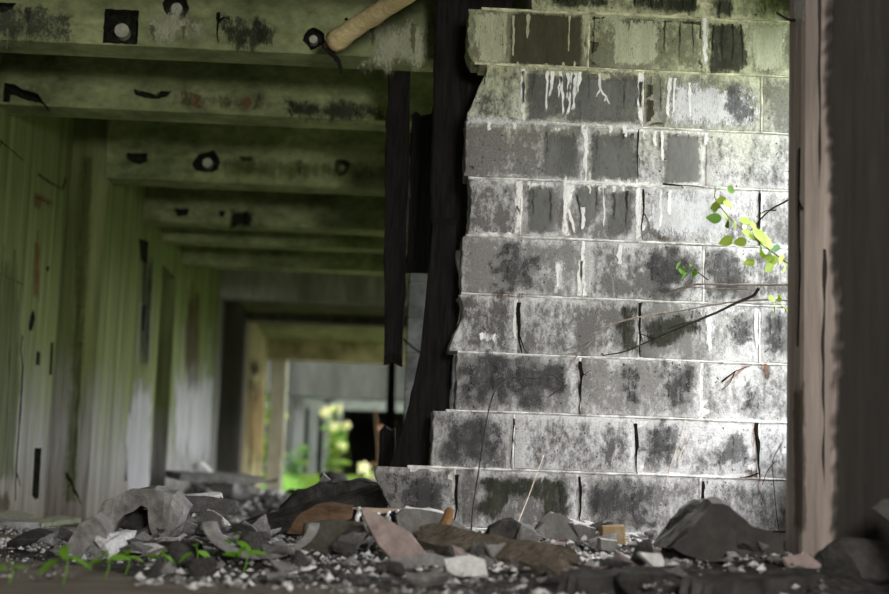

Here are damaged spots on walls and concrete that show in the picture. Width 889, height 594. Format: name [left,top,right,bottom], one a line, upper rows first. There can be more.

damp [125,378,152,490]
damp [137,255,153,365]
damp [172,326,214,470]
damp [385,0,785,534]
damp [793,334,807,531]
damp [818,0,889,544]